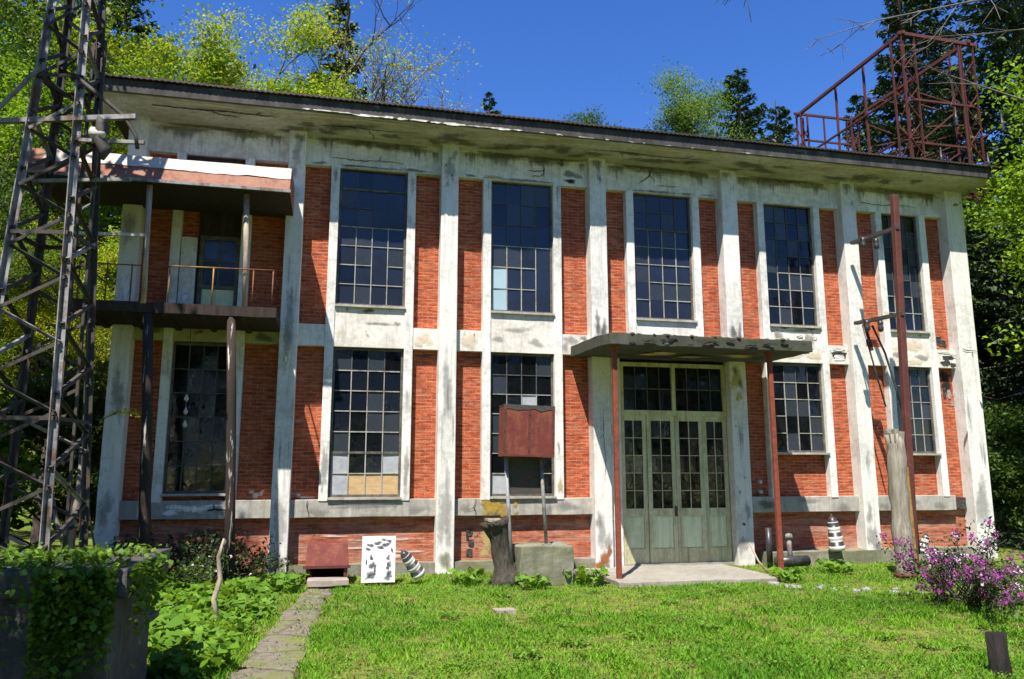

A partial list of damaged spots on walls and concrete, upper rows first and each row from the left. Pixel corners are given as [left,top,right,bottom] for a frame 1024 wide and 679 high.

crack [152,104,279,118]
damp [160,114,713,197]
damp [723,162,933,204]
spalling [618,329,847,400]
peeling [157,504,223,516]